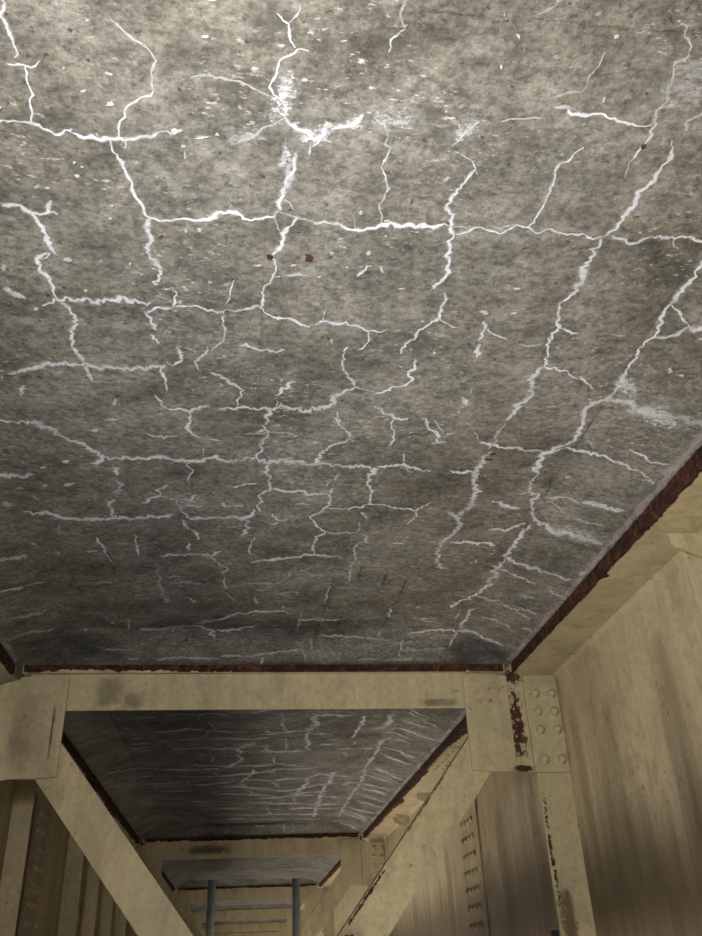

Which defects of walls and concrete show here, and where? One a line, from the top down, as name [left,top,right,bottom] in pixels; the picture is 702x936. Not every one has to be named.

damp [269,74,298,122]
damp [278,142,293,167]
damp [294,117,362,147]
damp [374,109,411,125]
rust [0,445,702,772]
rust [62,715,468,847]
crack [106,709,438,834]